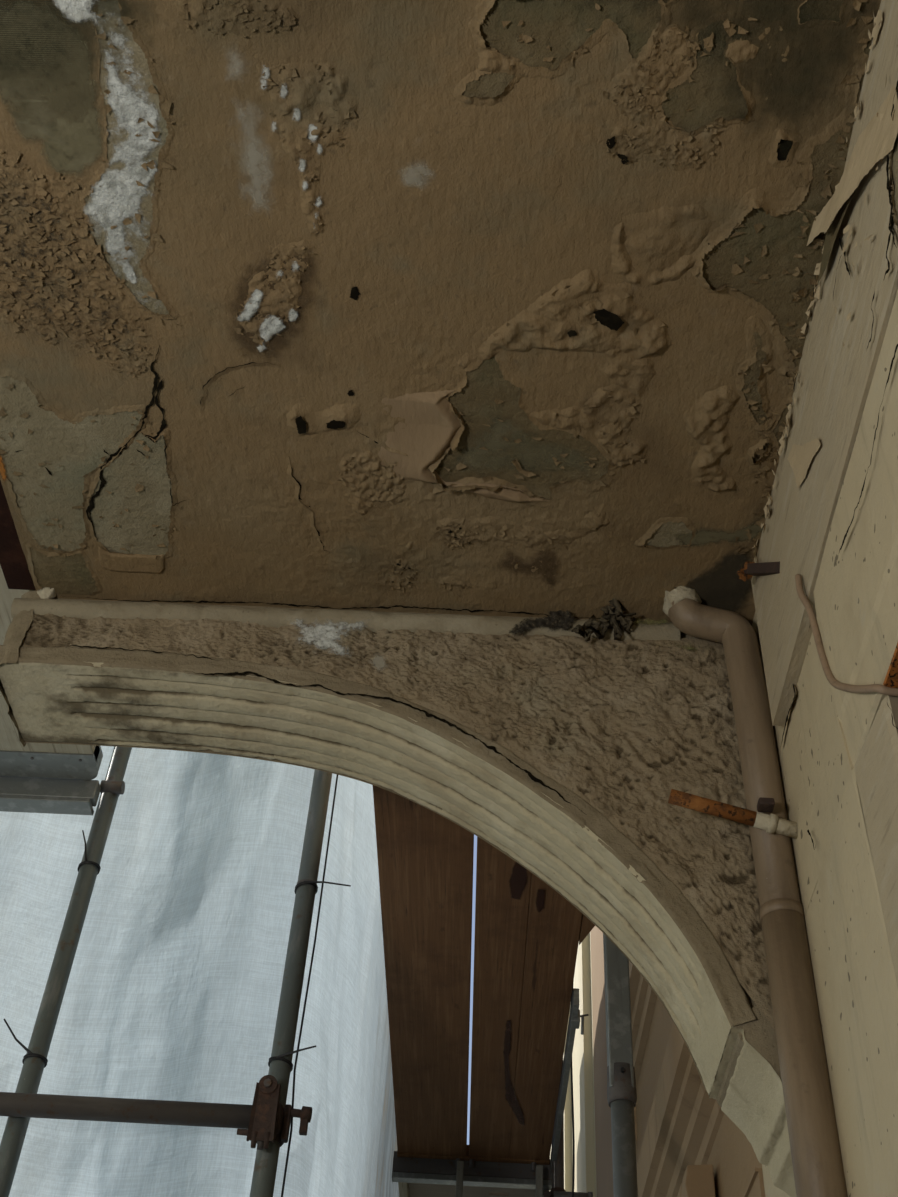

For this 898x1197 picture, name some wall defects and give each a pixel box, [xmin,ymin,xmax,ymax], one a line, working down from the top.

leakage [0,177,129,350]
leakage [0,0,159,284]
peeling [0,0,180,377]
peeling [453,0,680,106]
peeling [644,11,757,138]
peeling [689,0,898,554]
peeling [0,368,181,596]
crack [86,345,185,535]
peeling [427,325,622,510]